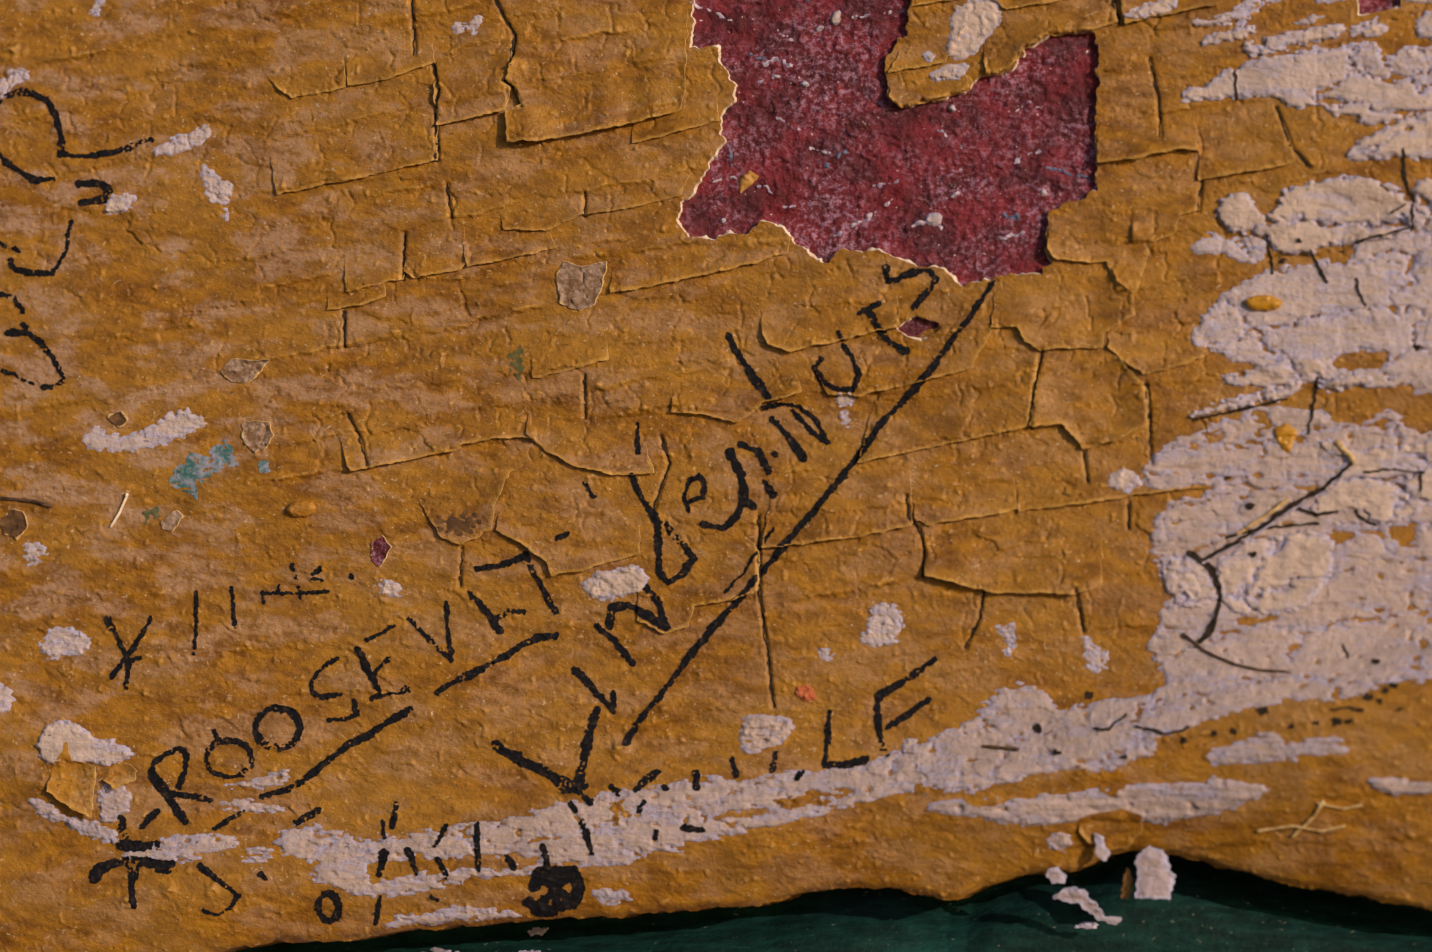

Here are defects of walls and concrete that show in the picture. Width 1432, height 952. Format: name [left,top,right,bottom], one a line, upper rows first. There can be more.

crack [495,0,523,107]
crack [411,0,454,218]
crack [340,310,348,348]
peeling [82,407,207,453]
crack [653,434,671,512]
peeling [241,0,1432,900]
crack [906,494,926,578]
crack [757,515,776,707]
peeling [28,720,137,844]
peeling [121,833,239,864]
peeling [385,905,549,952]
peeling [1046,867,1122,930]